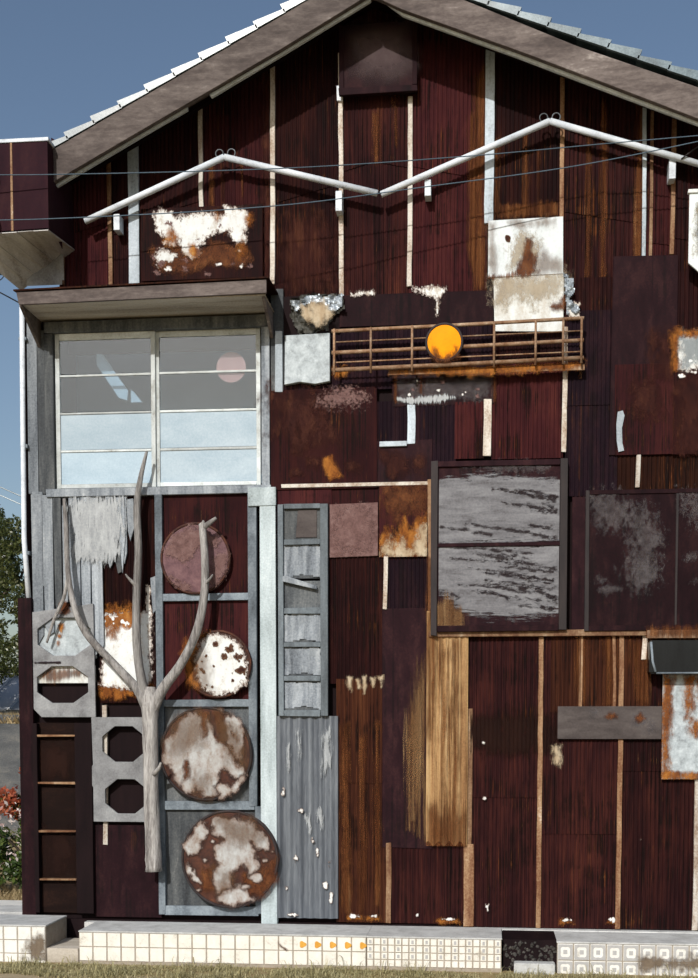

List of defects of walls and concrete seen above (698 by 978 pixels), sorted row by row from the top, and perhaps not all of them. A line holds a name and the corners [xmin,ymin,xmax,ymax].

corrosion [150,70,349,326]
corrosion [469,61,558,290]
corrosion [670,329,698,456]
corrosion [290,443,357,480]
peeling [439,474,560,622]
corrosion [100,685,134,700]
corrosion [104,604,141,639]
corrosion [181,634,246,690]
corrosion [379,450,560,846]
corrosion [629,625,698,723]
corrosion [661,674,698,780]
corrosion [242,860,278,898]